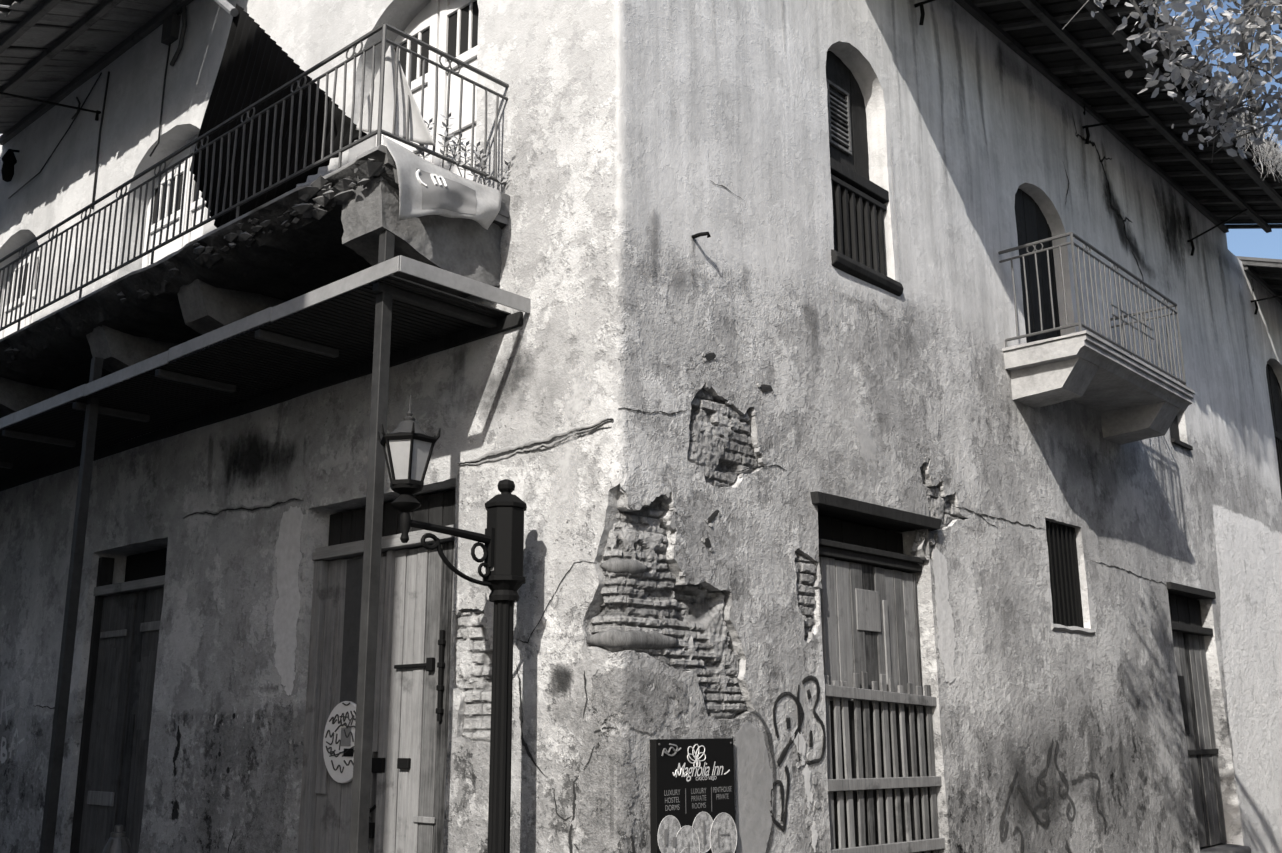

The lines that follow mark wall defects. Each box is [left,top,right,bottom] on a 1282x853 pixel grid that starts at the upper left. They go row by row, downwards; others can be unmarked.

water stain [1104,181,1145,267]
water stain [225,434,294,486]
crack [457,407,690,466]
spalling [687,352,766,488]
crack [183,497,304,519]
crack [953,506,1046,530]
spalling [794,552,822,641]
crack [1088,559,1164,584]
spalling [452,609,493,742]
crack [513,561,611,853]
spalling [570,488,746,853]